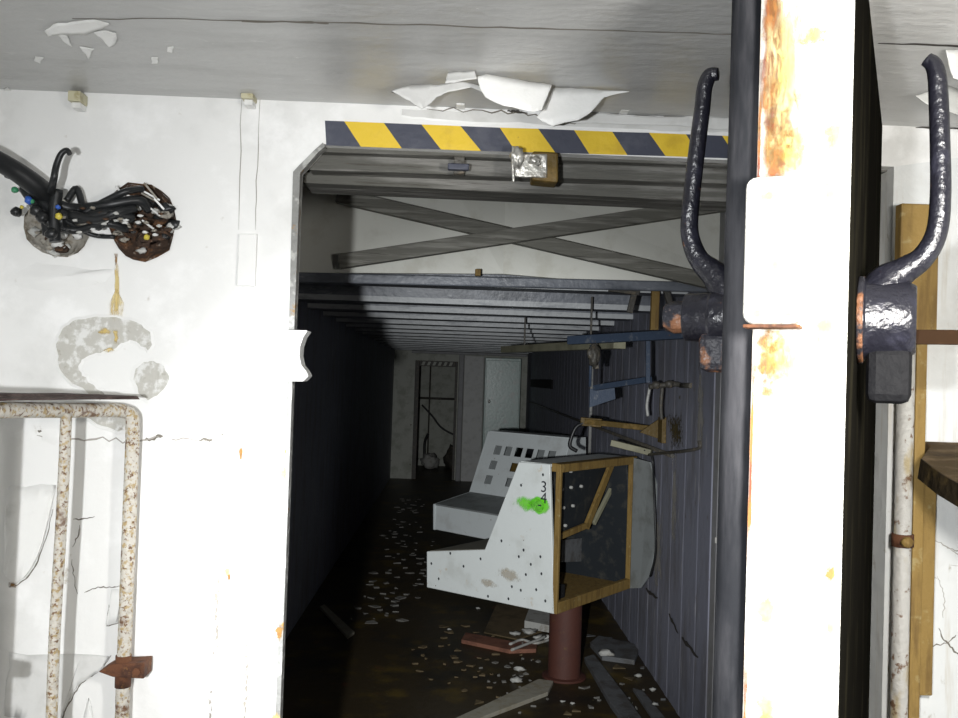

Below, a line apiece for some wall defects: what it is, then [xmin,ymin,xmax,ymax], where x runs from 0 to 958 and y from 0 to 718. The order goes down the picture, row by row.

peeling [44,19,117,59]
peeling [392,71,693,134]
peeling [707,117,729,135]
corrosion [757,0,825,177]
peeling [946,49,958,115]
spalling [53,314,173,404]
peeling [3,484,56,587]
corrosion [825,564,835,582]
crack [933,540,958,654]
peeling [4,652,48,718]
peeling [58,654,111,718]
corrosion [743,671,773,718]